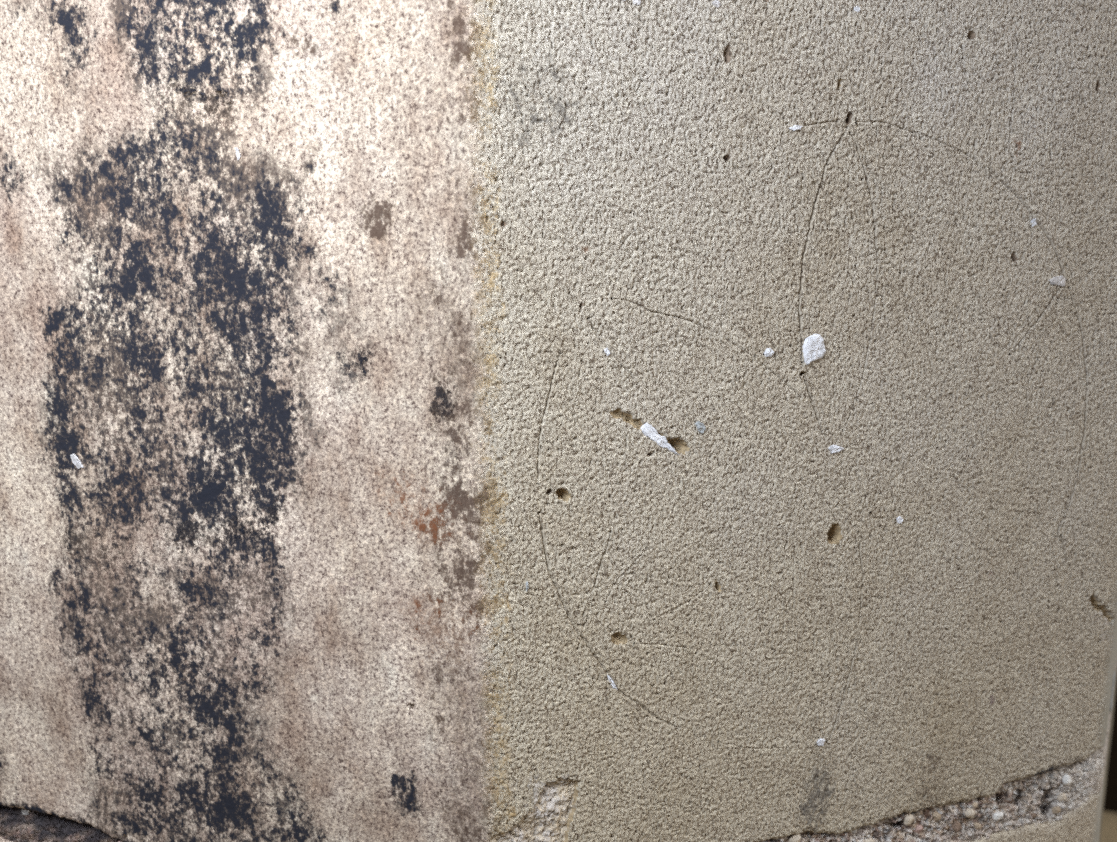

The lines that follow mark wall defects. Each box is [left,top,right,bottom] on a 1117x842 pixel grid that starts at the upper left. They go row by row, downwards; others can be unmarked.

water stain [447,0,478,124]
water stain [511,90,570,130]
water stain [357,195,396,239]
water stain [447,203,483,258]
water stain [336,344,372,393]
water stain [0,0,350,842]
water stain [426,308,491,639]
water stain [391,770,421,816]
water stain [440,777,569,842]
spalling [490,778,578,842]